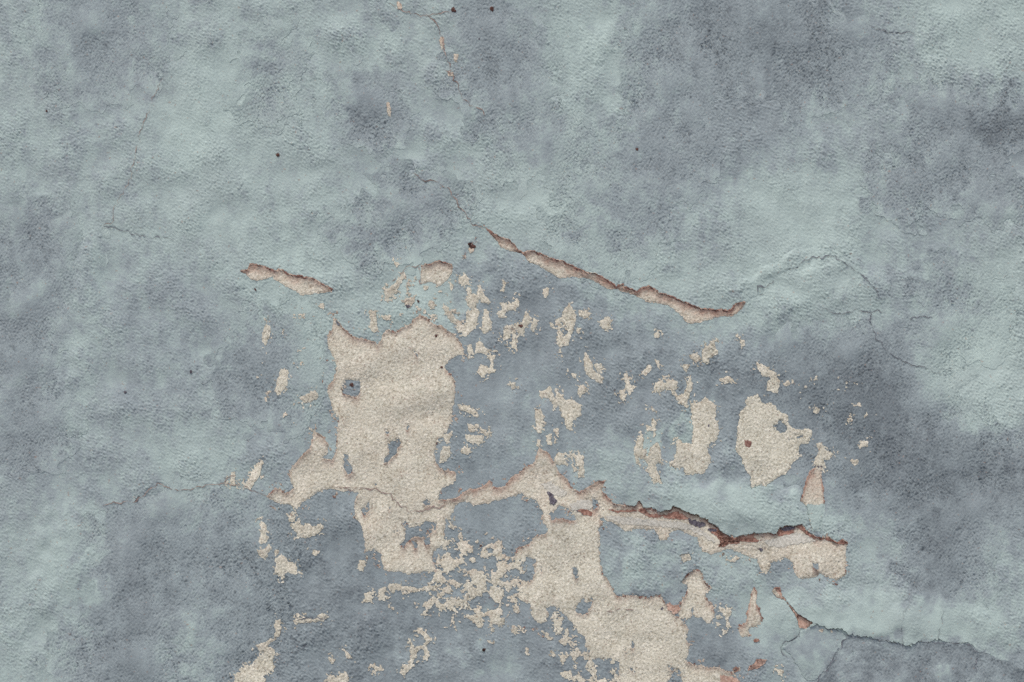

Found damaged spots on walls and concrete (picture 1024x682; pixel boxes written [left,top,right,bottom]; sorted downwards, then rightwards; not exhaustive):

crack [390,3,484,114]
crack [413,173,483,259]
spalling [483,225,746,324]
crack [756,255,940,374]
peeling [225,257,873,682]
crack [780,615,986,682]